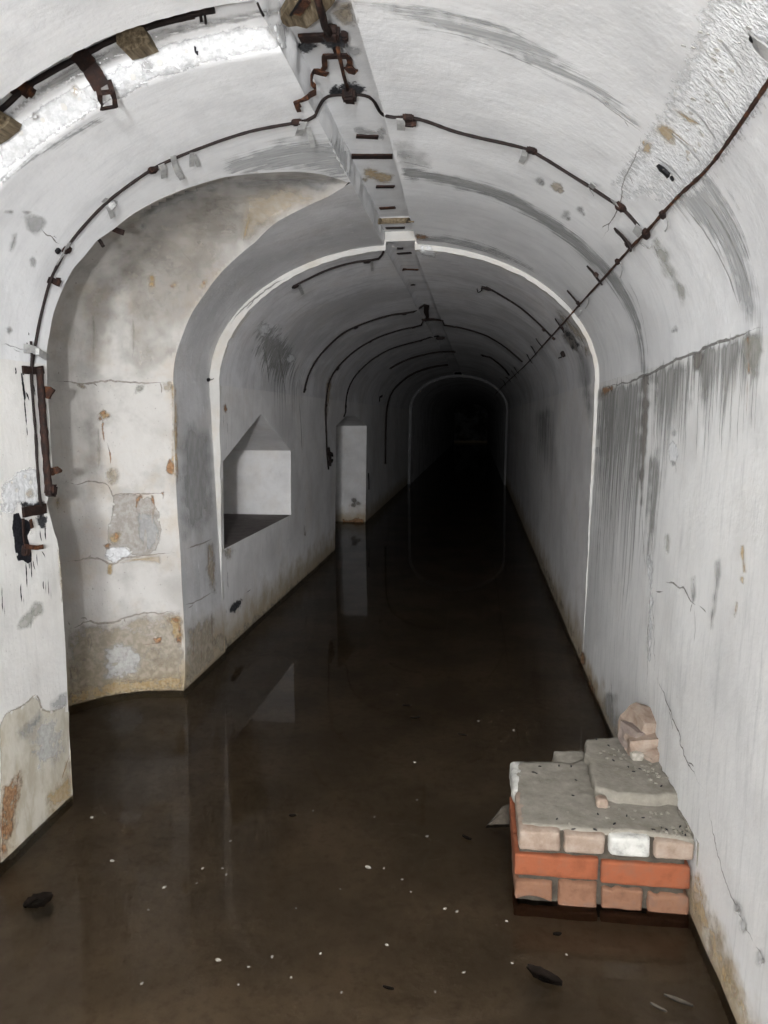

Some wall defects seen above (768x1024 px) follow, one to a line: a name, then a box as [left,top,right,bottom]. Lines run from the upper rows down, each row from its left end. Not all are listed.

water stain [150,191,194,212]
water stain [229,141,350,236]
crack [594,97,641,230]
water stain [253,325,295,389]
water stain [400,154,760,583]
crack [607,330,751,391]
spalling [1,469,47,584]
spalling [108,495,162,555]
crack [646,529,706,774]
peeling [0,695,73,863]